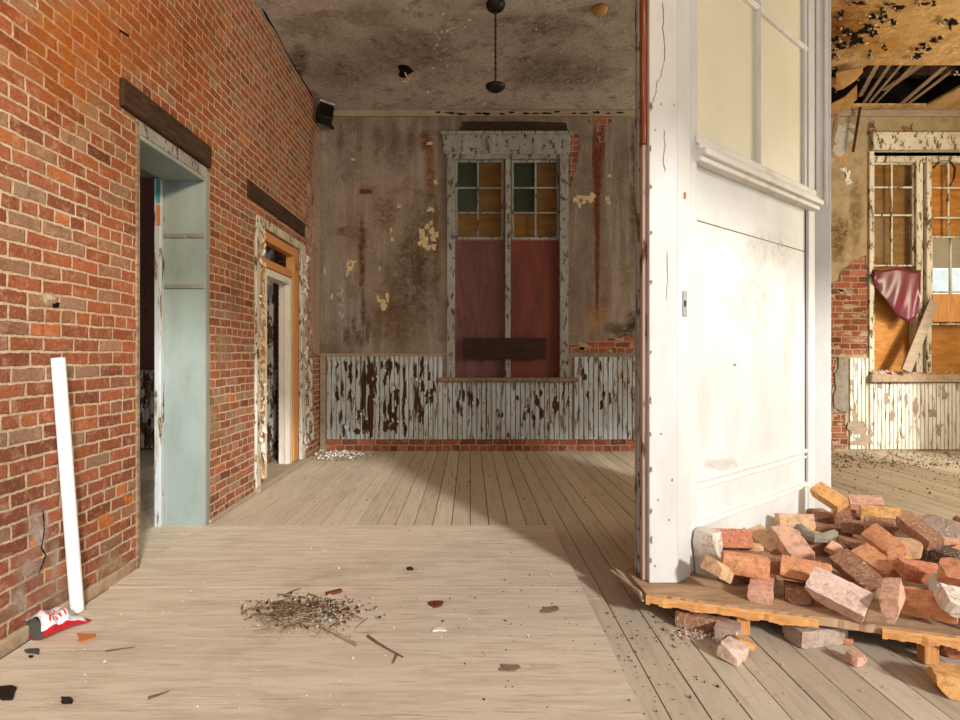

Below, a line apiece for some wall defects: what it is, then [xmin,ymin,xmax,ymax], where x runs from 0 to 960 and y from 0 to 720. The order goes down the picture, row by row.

spalling [831,0,960,103]
flaking render [568,131,611,209]
peeling [418,207,439,251]
corrosion [592,128,605,315]
flaking render [569,333,635,371]
flaking render [831,255,875,451]
peeling [334,356,435,439]
peeling [456,387,479,417]
peeling [515,390,570,428]
peeling [580,366,615,410]
peeling [874,382,895,421]
crack [38,510,47,574]